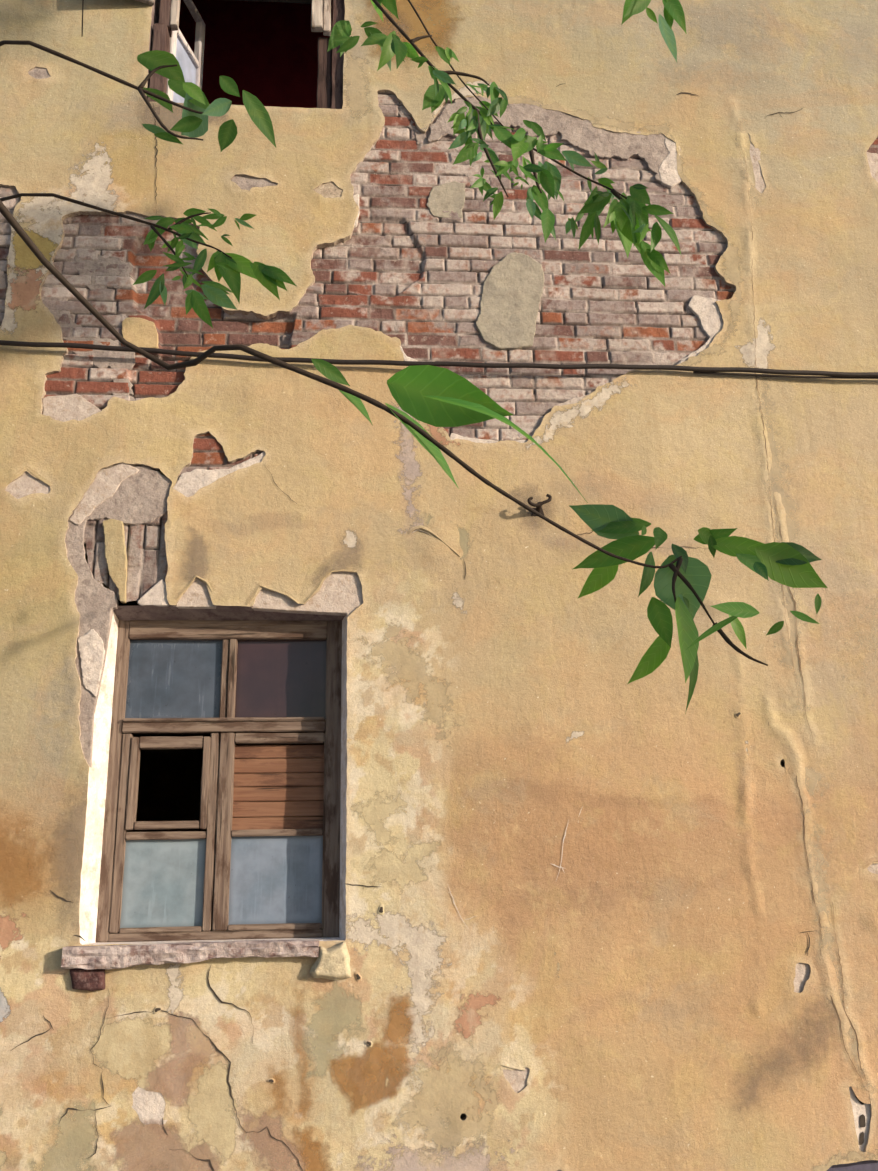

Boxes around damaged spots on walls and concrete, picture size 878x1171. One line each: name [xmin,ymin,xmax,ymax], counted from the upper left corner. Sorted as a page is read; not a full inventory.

leakage [369,0,453,57]
flaking render [0,52,776,450]
crack [676,92,805,544]
flaking render [64,431,266,768]
flaking render [245,568,363,617]
crack [756,577,878,1104]
crack [12,1016,53,1050]
crack [59,990,303,1171]
crack [207,963,254,1038]
peeling [346,904,530,1171]
flaking render [793,963,811,993]
flaking render [813,1086,878,1171]